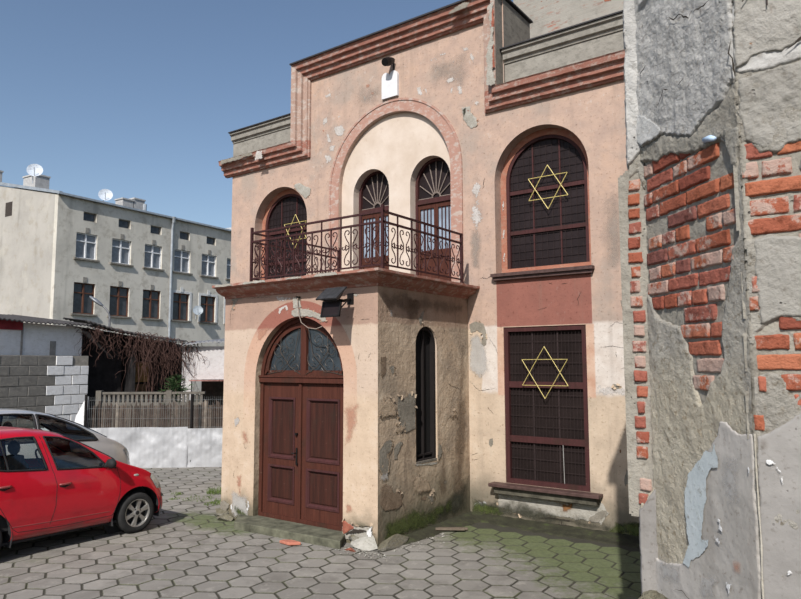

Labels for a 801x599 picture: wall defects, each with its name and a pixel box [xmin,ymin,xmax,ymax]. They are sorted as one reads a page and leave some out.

crack [667,0,709,20]
flaking render [462,101,479,129]
flaking render [636,115,661,145]
peeling [470,183,483,265]
flaking render [276,296,327,322]
flaking render [469,320,487,377]
flaking render [599,141,801,517]
flaking render [397,391,417,433]
flaking render [378,439,403,511]
peeling [683,444,722,568]